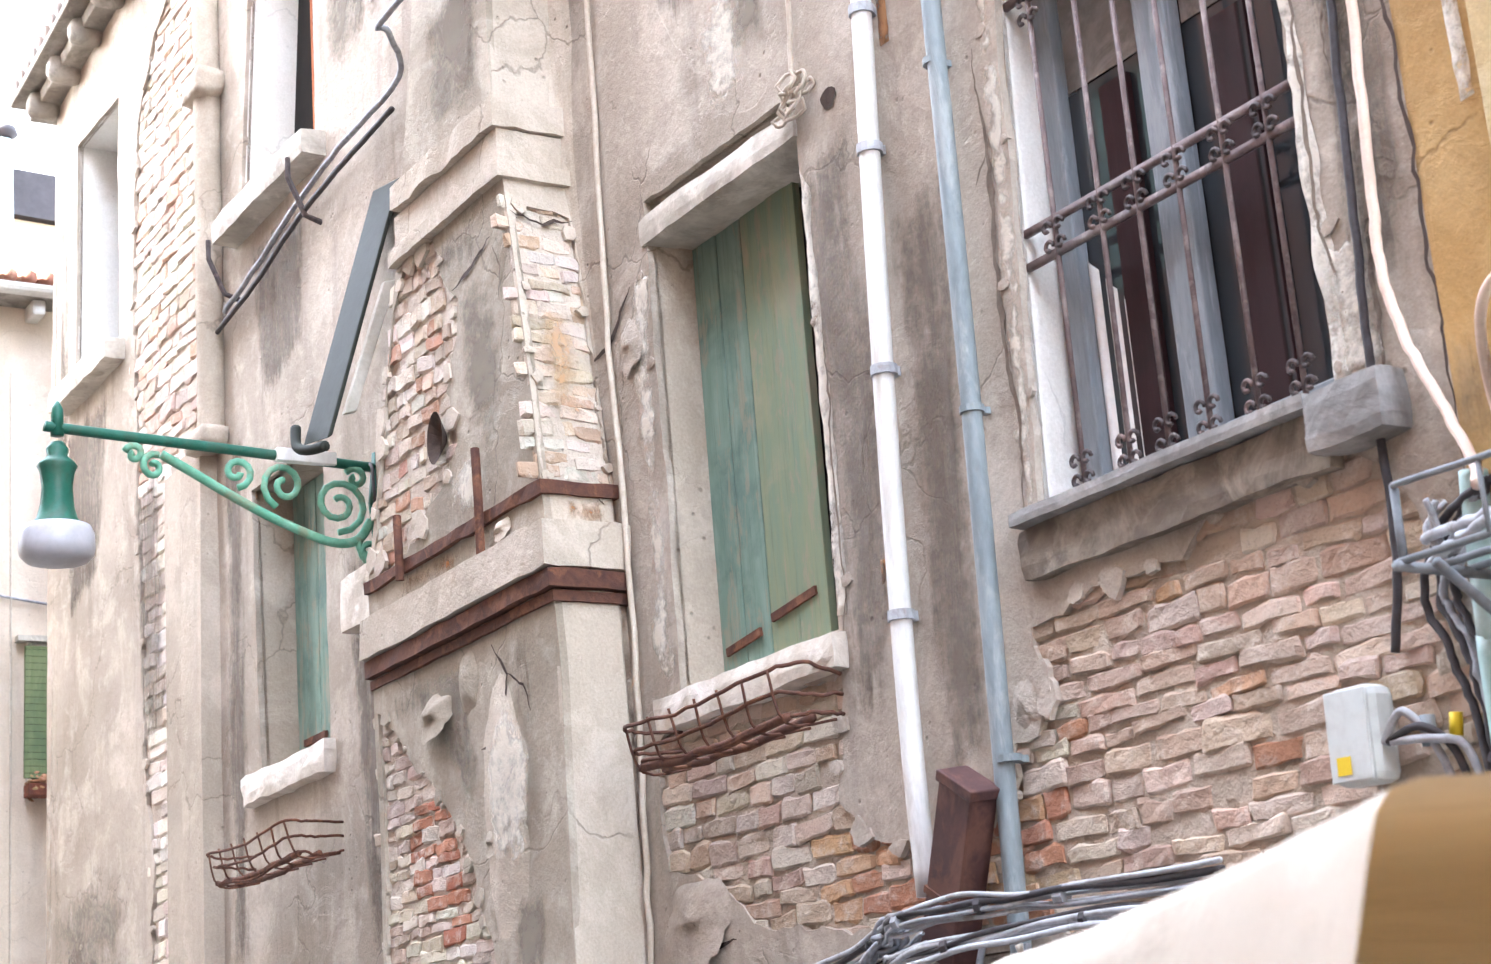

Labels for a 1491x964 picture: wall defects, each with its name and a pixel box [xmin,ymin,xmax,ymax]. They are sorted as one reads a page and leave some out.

spalling [129,0,197,964]
spalling [366,242,460,577]
flaking render [490,194,613,505]
crack [1288,0,1386,365]
crack [1380,0,1465,469]
spalling [373,711,496,964]
spalling [660,676,926,934]
spalling [982,807,1007,928]